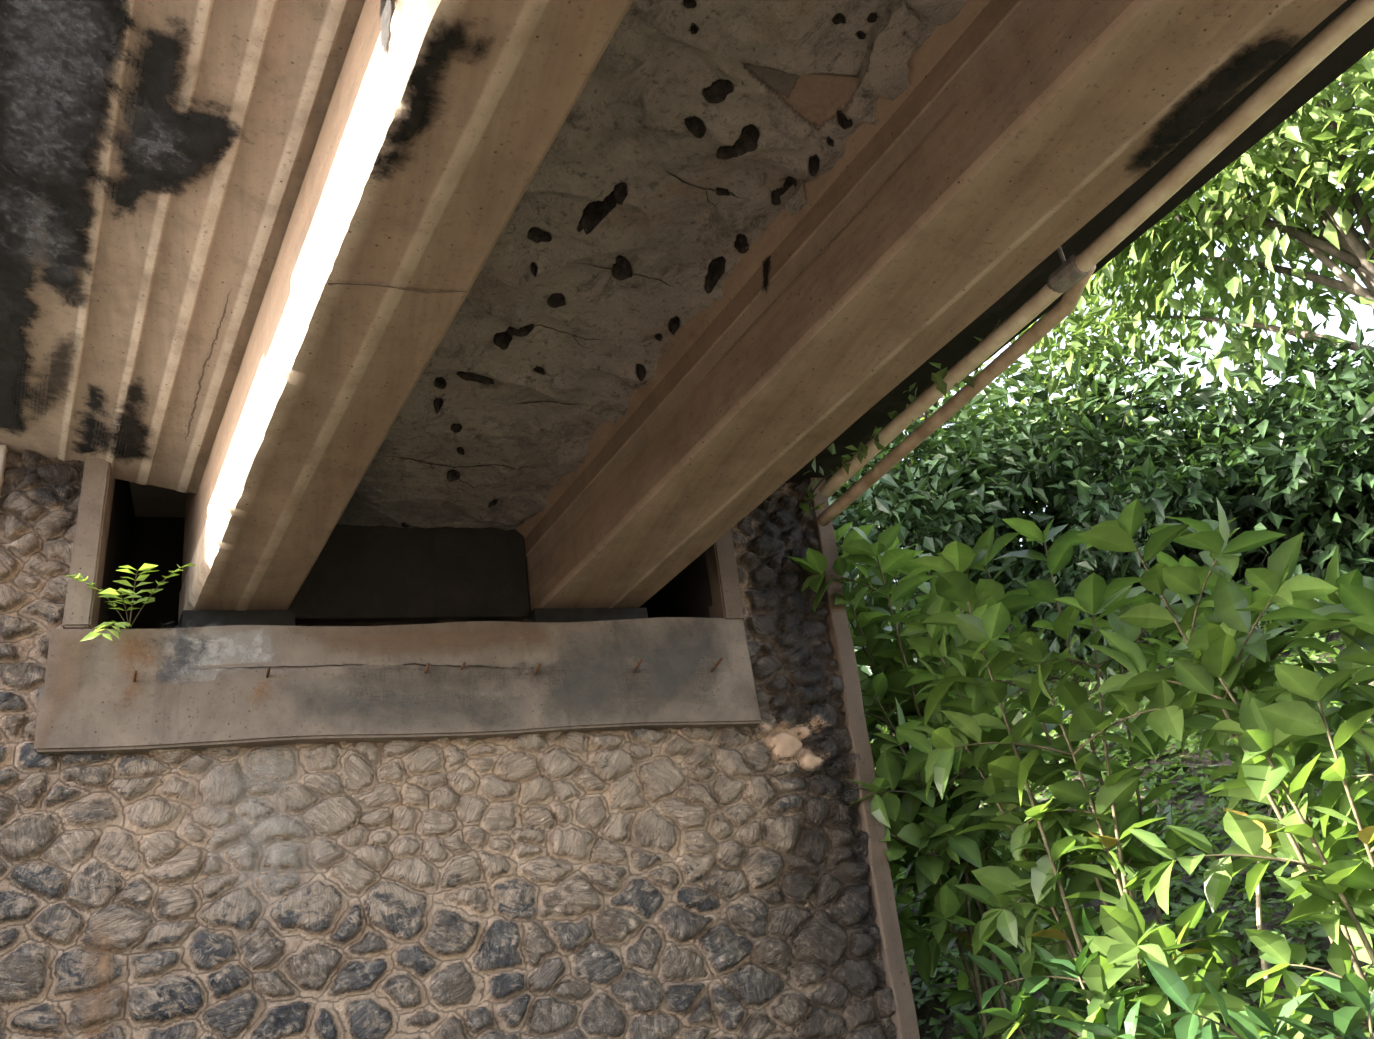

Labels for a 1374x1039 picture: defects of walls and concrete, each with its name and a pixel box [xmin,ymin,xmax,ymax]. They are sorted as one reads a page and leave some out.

spalling [380,0,391,57]
spalling [683,0,698,34]
mould [369,22,488,180]
leakage [1127,30,1298,175]
mould [0,0,241,435]
hole [705,234,749,294]
spalling [655,316,679,341]
hole [434,377,446,414]
spalling [636,363,646,381]
mould [13,385,150,510]
hole [447,423,464,481]